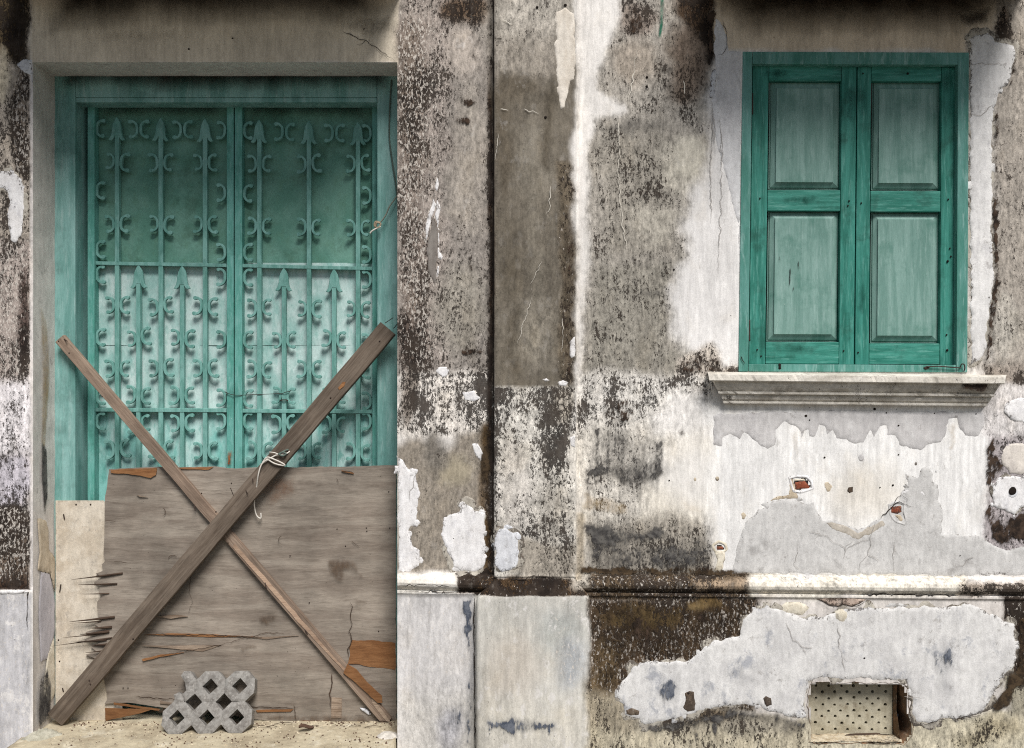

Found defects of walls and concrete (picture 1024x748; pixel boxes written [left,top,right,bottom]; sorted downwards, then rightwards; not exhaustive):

peeling [554,8,576,109]
water stain [457,99,475,125]
peeling [0,166,29,243]
crack [710,108,724,273]
water stain [586,399,663,488]
flaking render [788,475,832,501]
flaking render [888,501,907,525]
water stain [581,524,748,578]
water stain [660,679,677,699]
flaking render [672,691,696,724]
spalling [811,681,914,745]
water stain [993,618,1024,710]